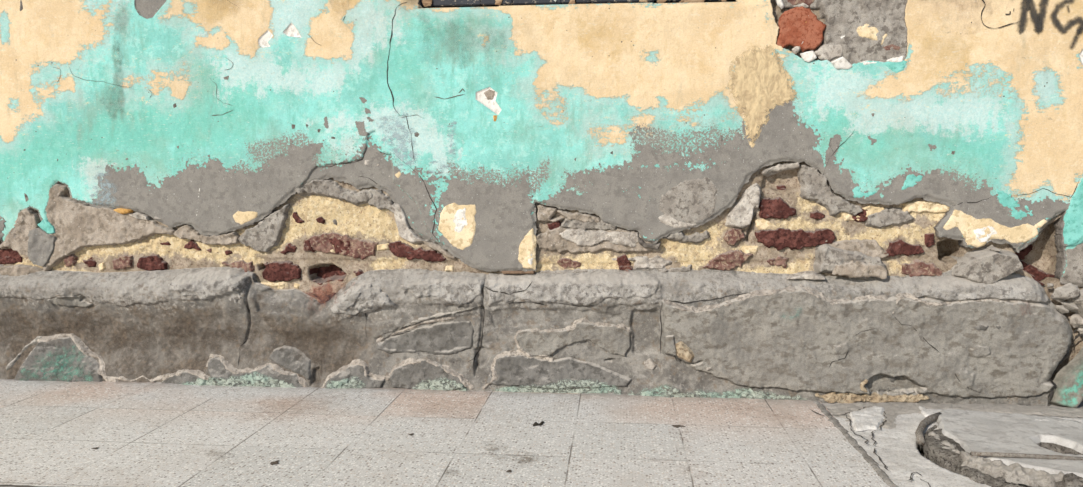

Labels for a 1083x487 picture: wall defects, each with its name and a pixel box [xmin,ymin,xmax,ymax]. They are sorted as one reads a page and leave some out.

flaking render [134,0,166,19]
flaking render [774,0,907,73]
crack [326,2,465,242]
flaking render [0,97,1083,315]
crack [238,291,251,366]
crack [356,280,590,367]
crack [660,293,745,360]